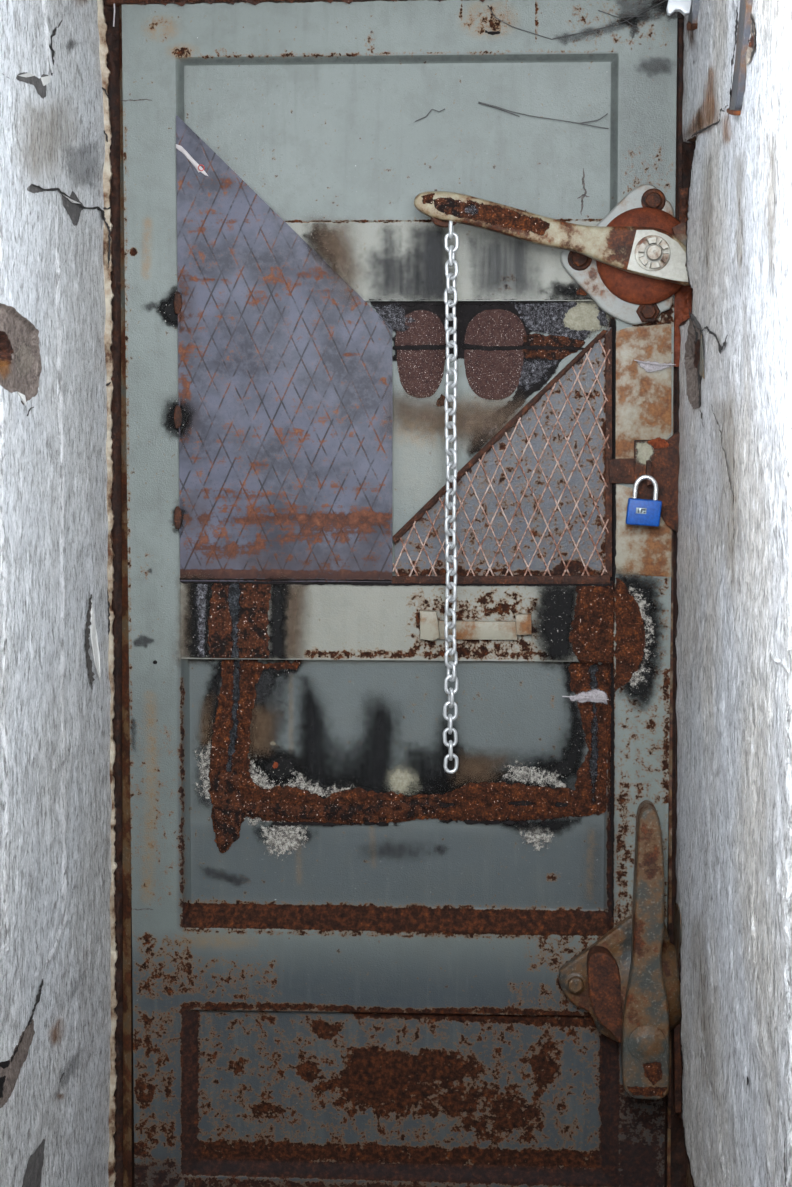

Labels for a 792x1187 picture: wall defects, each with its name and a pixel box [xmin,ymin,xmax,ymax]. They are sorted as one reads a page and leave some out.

crack [32,184,111,268]
spalling [679,136,705,425]
spalling [0,303,42,416]
crack [700,326,728,354]
rust [647,437,670,449]
rust [207,578,646,853]
crack [27,979,43,1026]